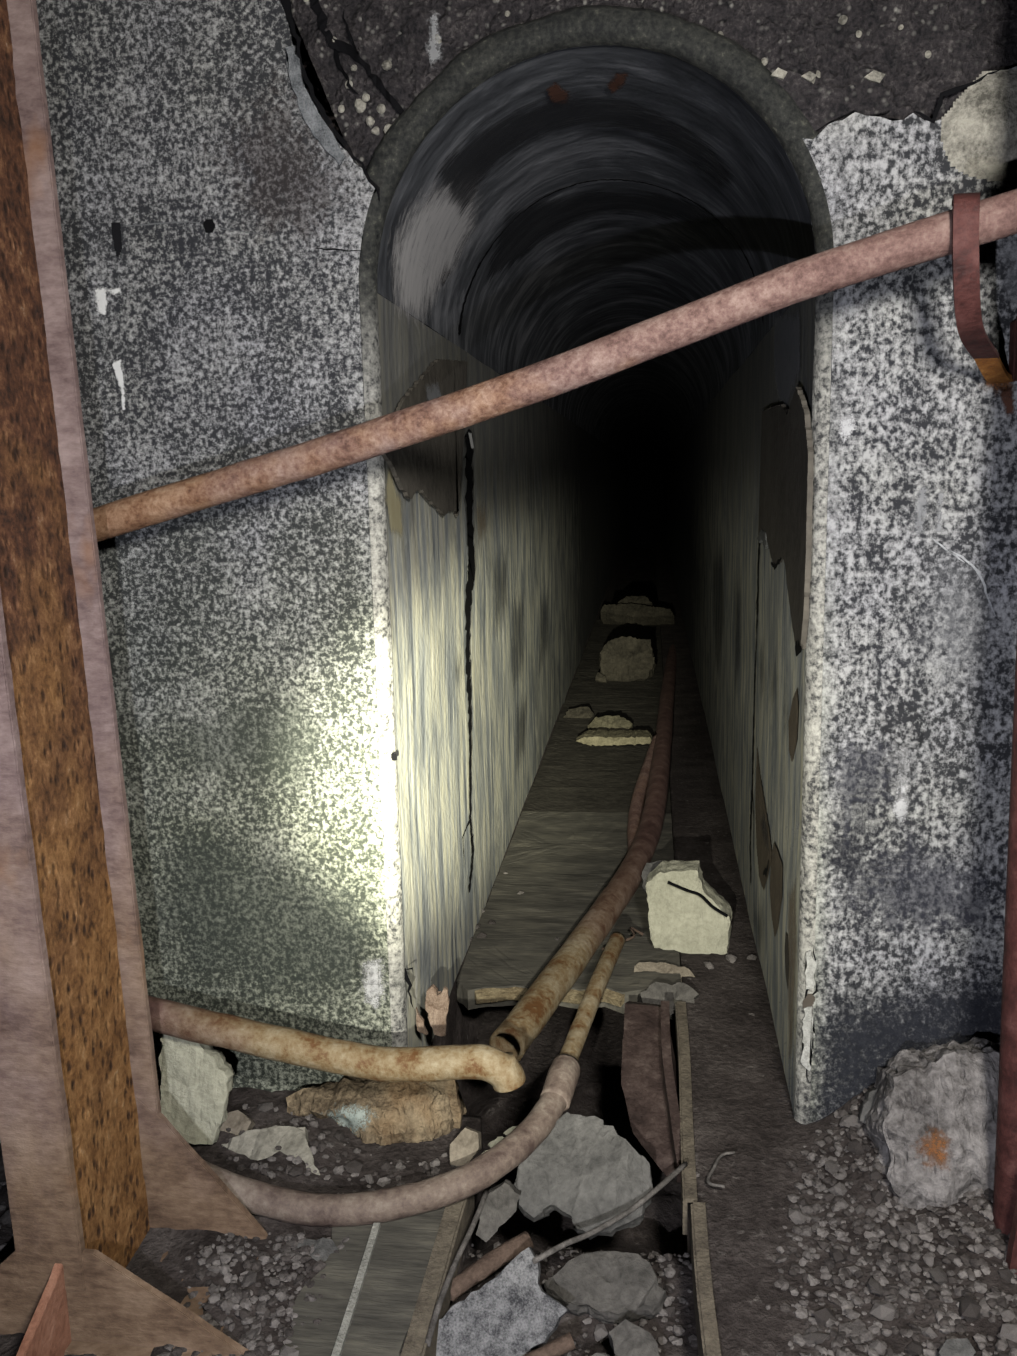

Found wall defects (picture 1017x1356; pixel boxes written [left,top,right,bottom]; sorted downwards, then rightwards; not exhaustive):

crack [280,0,404,201]
spalling [285,0,1017,170]
flaking render [758,387,814,656]
crack [462,429,475,892]
peeling [788,689,798,762]
peeling [755,749,817,1071]